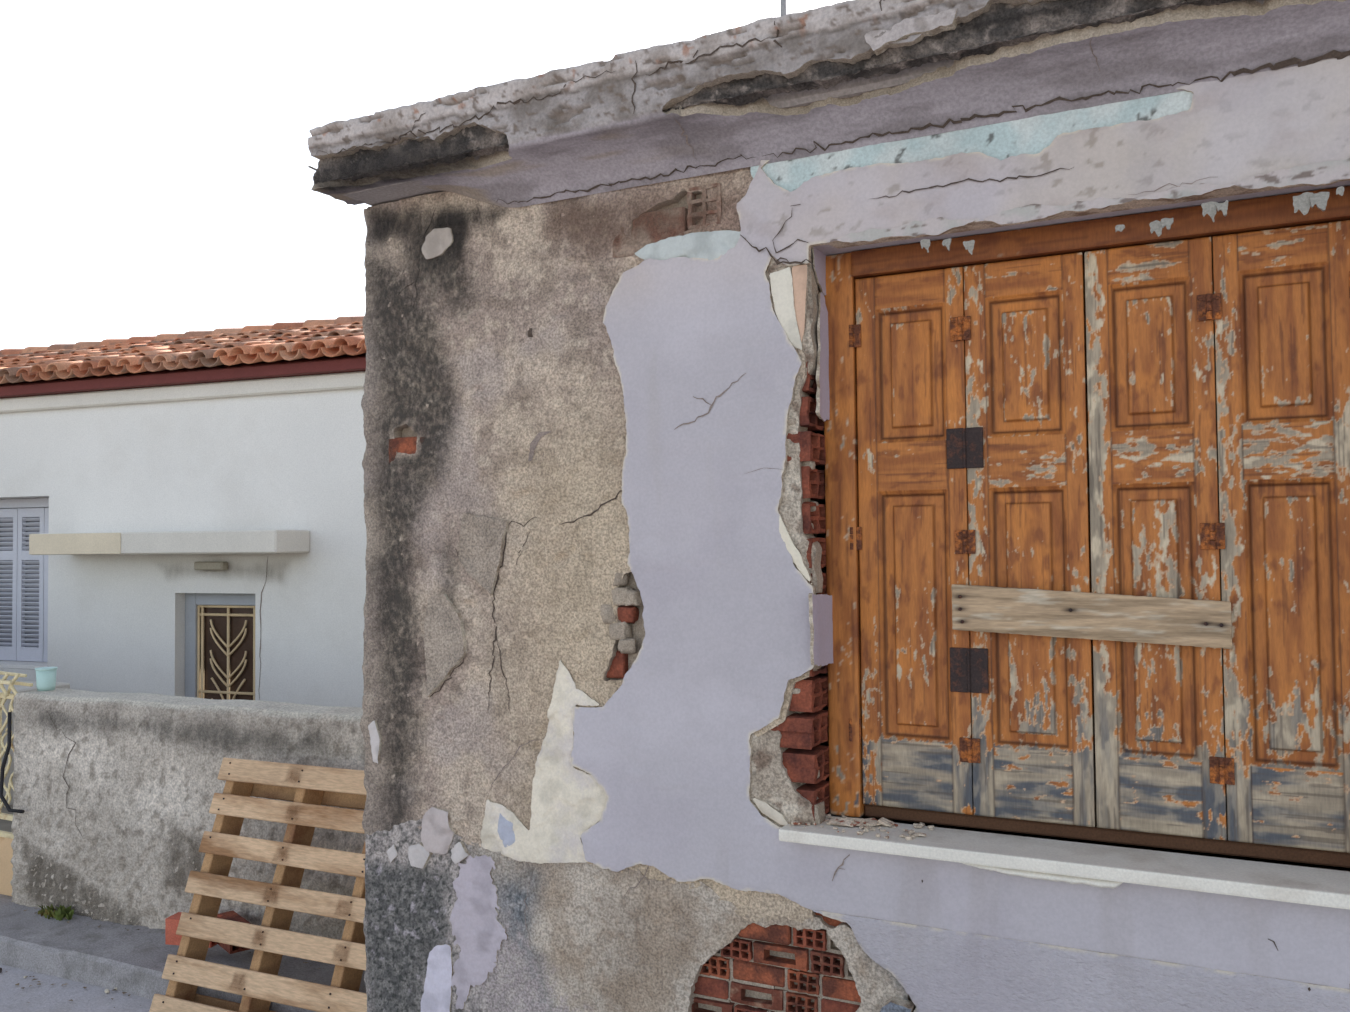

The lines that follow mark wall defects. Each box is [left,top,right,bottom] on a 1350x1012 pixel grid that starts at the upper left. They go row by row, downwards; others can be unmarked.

spalling [313,125,509,184]
crack [314,18,782,158]
crack [494,33,1350,204]
damp [372,208,481,830]
crack [430,490,622,795]
crack [674,373,746,430]
spalling [360,91,1193,1012]
spalling [750,158,1350,826]